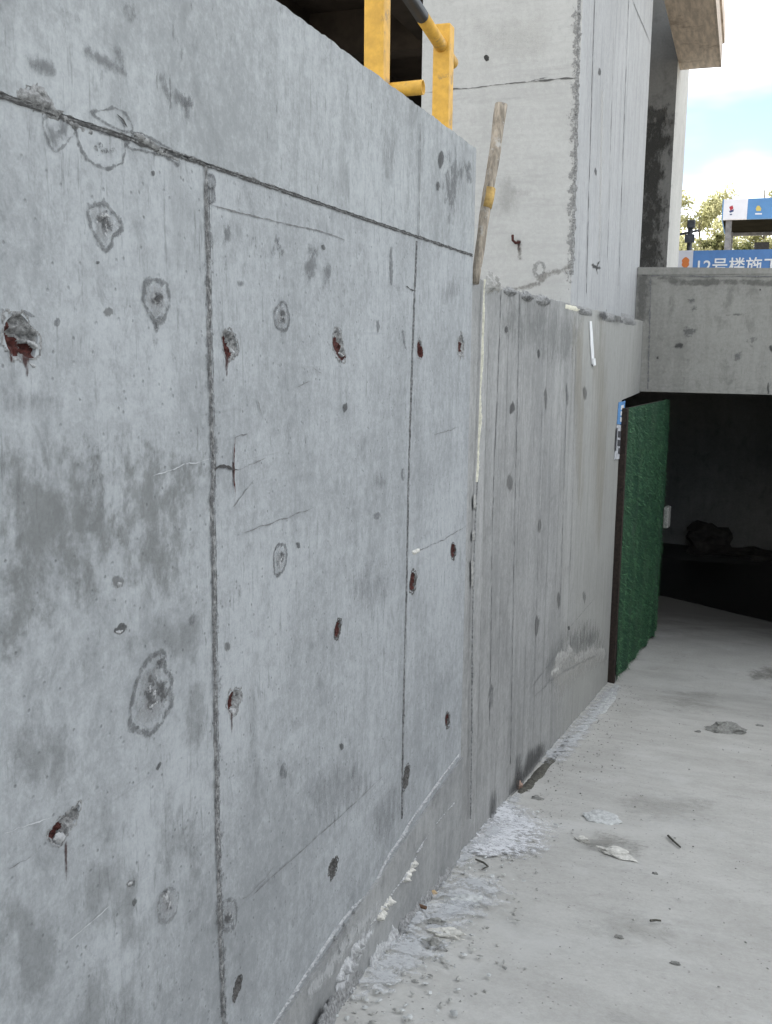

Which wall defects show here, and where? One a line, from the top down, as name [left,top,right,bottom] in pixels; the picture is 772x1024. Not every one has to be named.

spalling [1,309,42,376]
crack [0,97,472,776]
spalling [146,657,168,710]